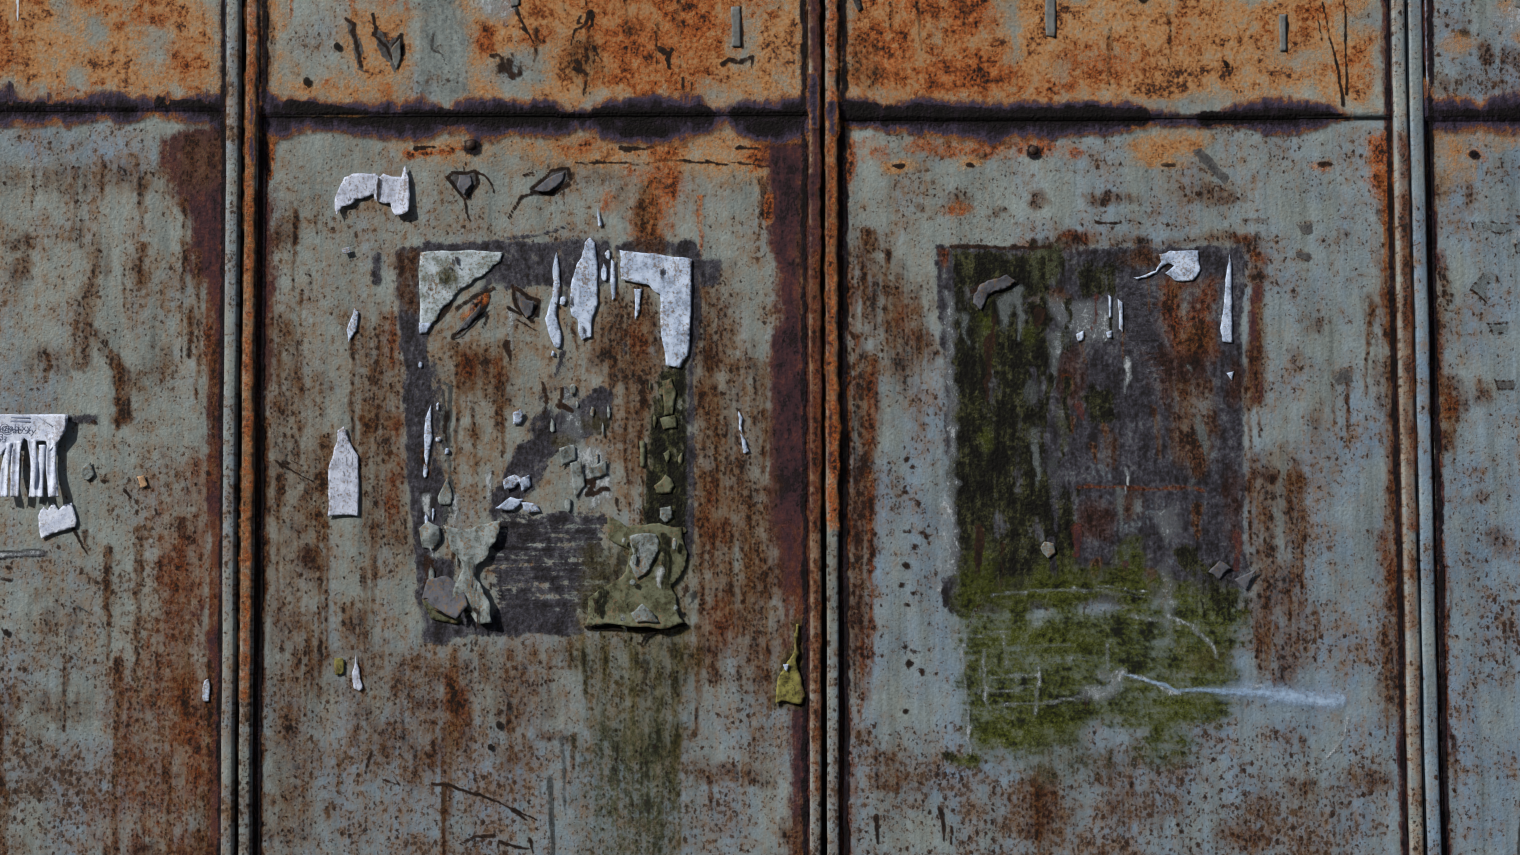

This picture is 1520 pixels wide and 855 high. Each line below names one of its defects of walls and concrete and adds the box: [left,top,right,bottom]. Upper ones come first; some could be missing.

rust [0,0,236,855]
peeling [435,284,540,340]
rust [234,0,1420,855]
leakage [1128,675,1263,694]